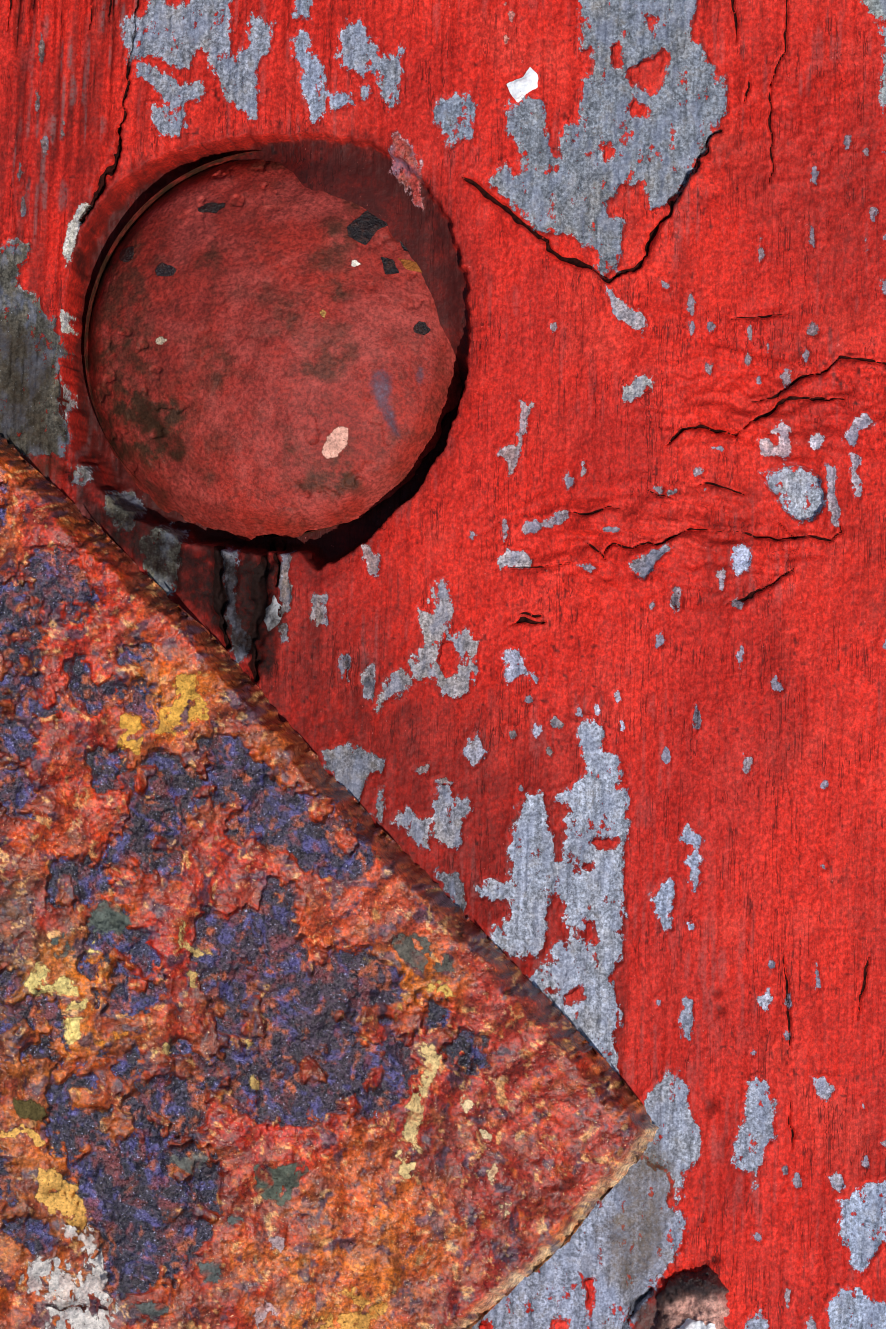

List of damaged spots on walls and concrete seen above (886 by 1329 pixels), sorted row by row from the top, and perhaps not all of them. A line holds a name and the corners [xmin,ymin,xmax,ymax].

peeling [119,0,406,138]
crack [462,129,722,283]
peeling [488,0,728,338]
crack [731,313,782,321]
crack [669,356,886,444]
crack [700,482,744,495]
corrosion [117,671,209,755]
peeling [433,704,631,1075]
corrosion [24,963,128,1048]
corrosion [178,922,212,988]
corrosion [0,1124,87,1233]
peeling [471,1070,702,1329]